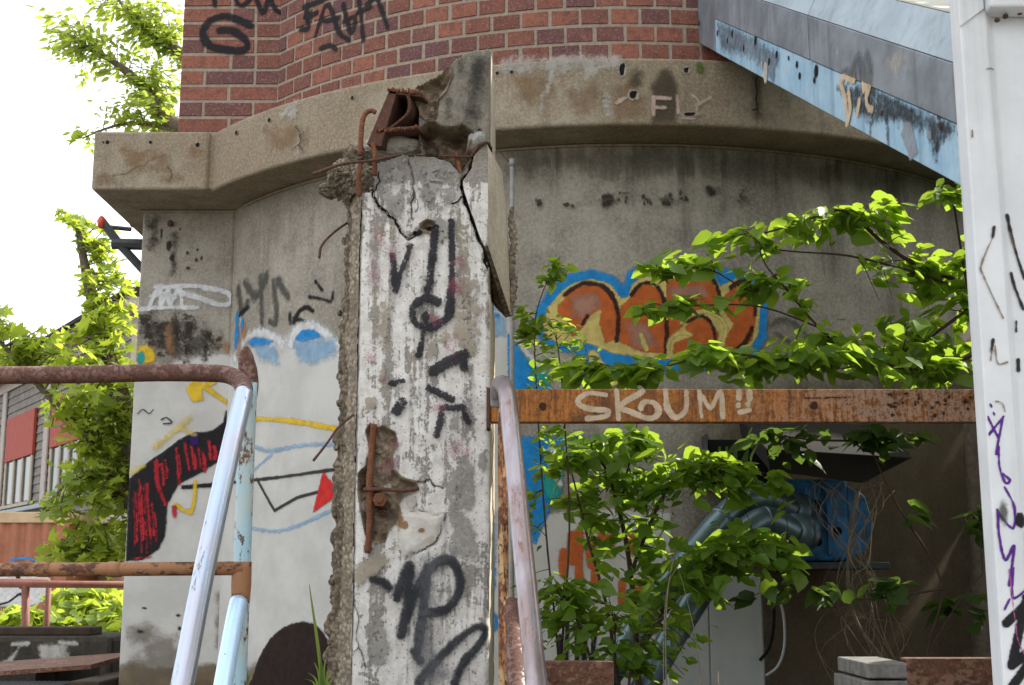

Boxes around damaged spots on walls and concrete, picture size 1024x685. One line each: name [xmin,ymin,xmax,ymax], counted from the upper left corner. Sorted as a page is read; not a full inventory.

peeling [717,22,779,83]
peeling [838,85,951,161]
crack [369,158,443,241]
crack [451,129,489,269]
water stain [601,191,628,207]
water stain [641,189,689,206]
water stain [139,312,229,361]
spalling [312,64,488,685]
corrosion [887,393,950,418]